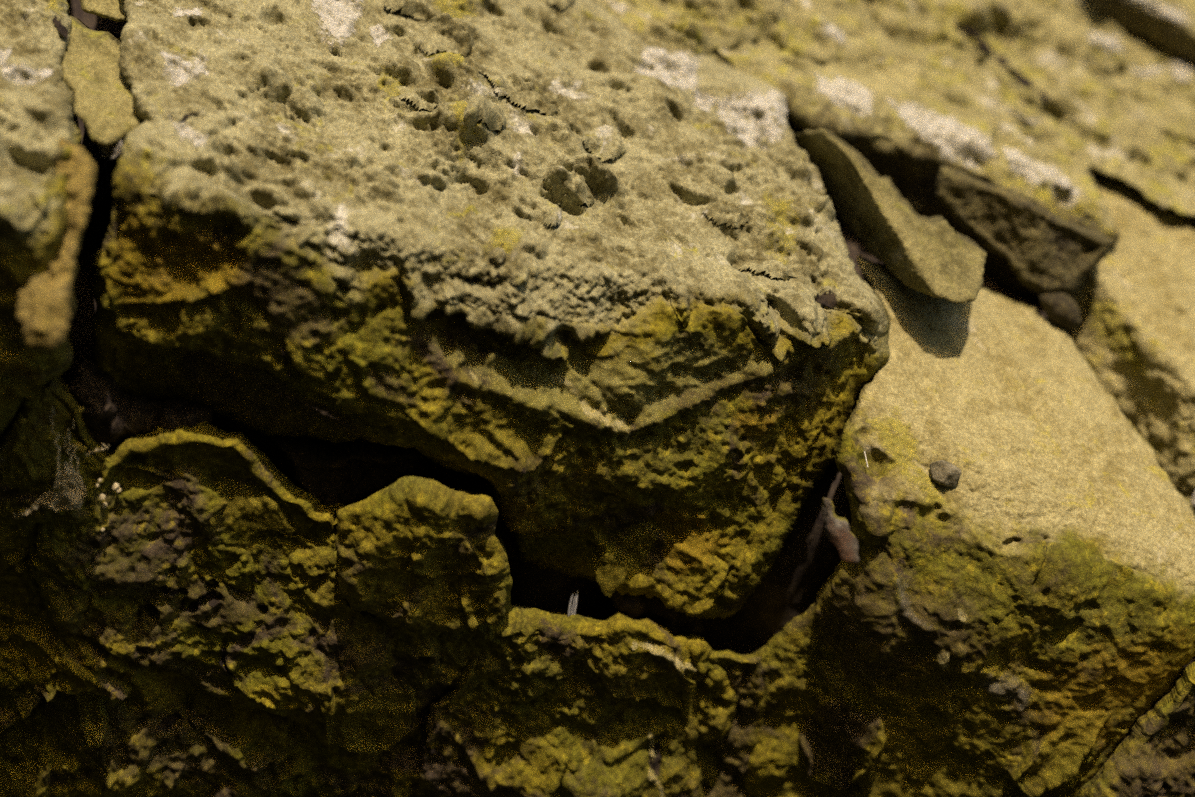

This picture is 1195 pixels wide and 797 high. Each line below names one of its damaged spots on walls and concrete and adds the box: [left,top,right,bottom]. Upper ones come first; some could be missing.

crack [52,15,68,41]
crack [460,273,502,285]